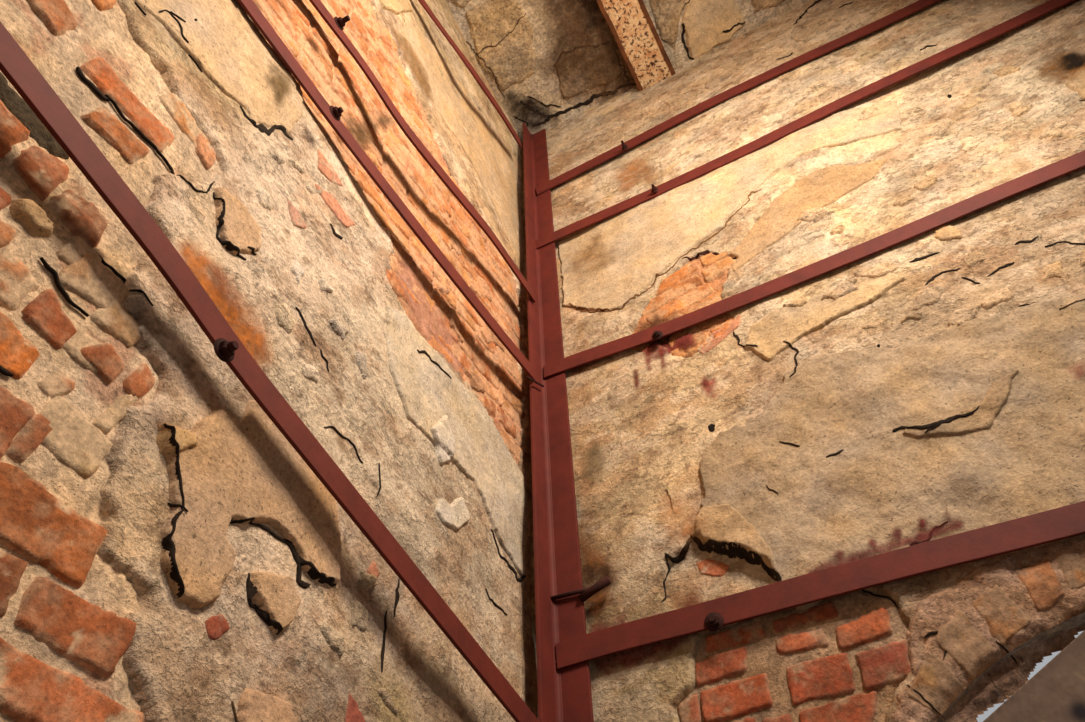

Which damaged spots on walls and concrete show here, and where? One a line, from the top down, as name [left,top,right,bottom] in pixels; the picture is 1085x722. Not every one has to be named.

peeling [778,70,800,81]
crack [240,106,293,140]
crack [76,66,257,260]
peeling [558,101,902,334]
peeling [893,174,938,207]
peeling [933,224,963,241]
crack [910,236,1085,285]
peeling [630,262,906,361]
peeling [696,286,1085,581]
crack [161,424,189,598]
crack [230,517,337,589]
crack [661,535,782,602]